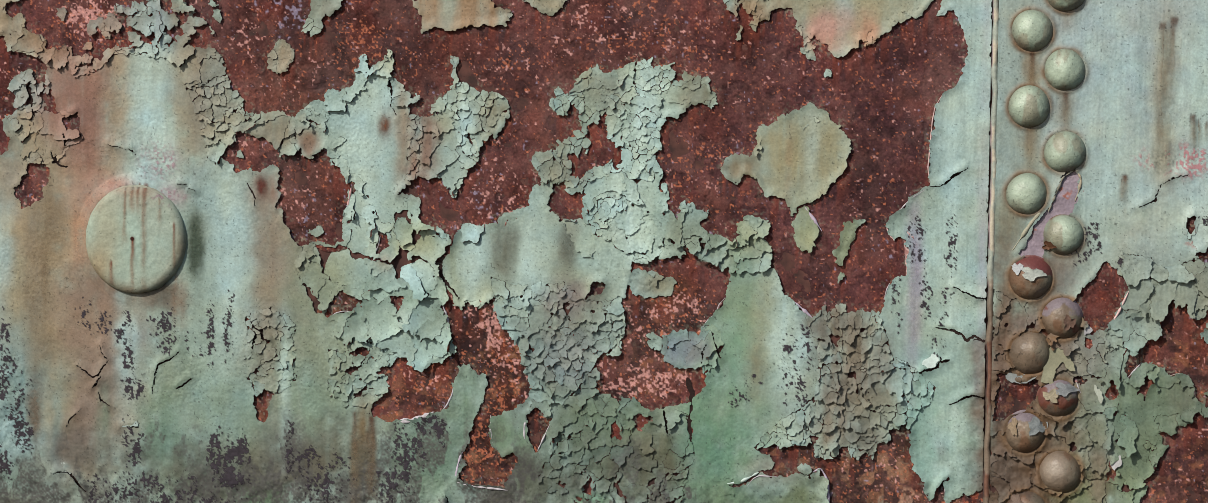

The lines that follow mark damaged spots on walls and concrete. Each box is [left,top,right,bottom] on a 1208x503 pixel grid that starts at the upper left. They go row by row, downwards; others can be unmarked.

peeling [0,0,772,503]
rust [0,0,968,488]
peeling [698,0,1208,503]
rust [1186,216,1208,268]
water stain [75,290,251,503]
crack [250,321,271,349]
crack [919,327,985,374]
crack [949,395,985,405]
rust [1075,261,1129,355]
rust [1069,299,1208,503]
water stain [285,410,357,503]
water stain [373,412,450,503]